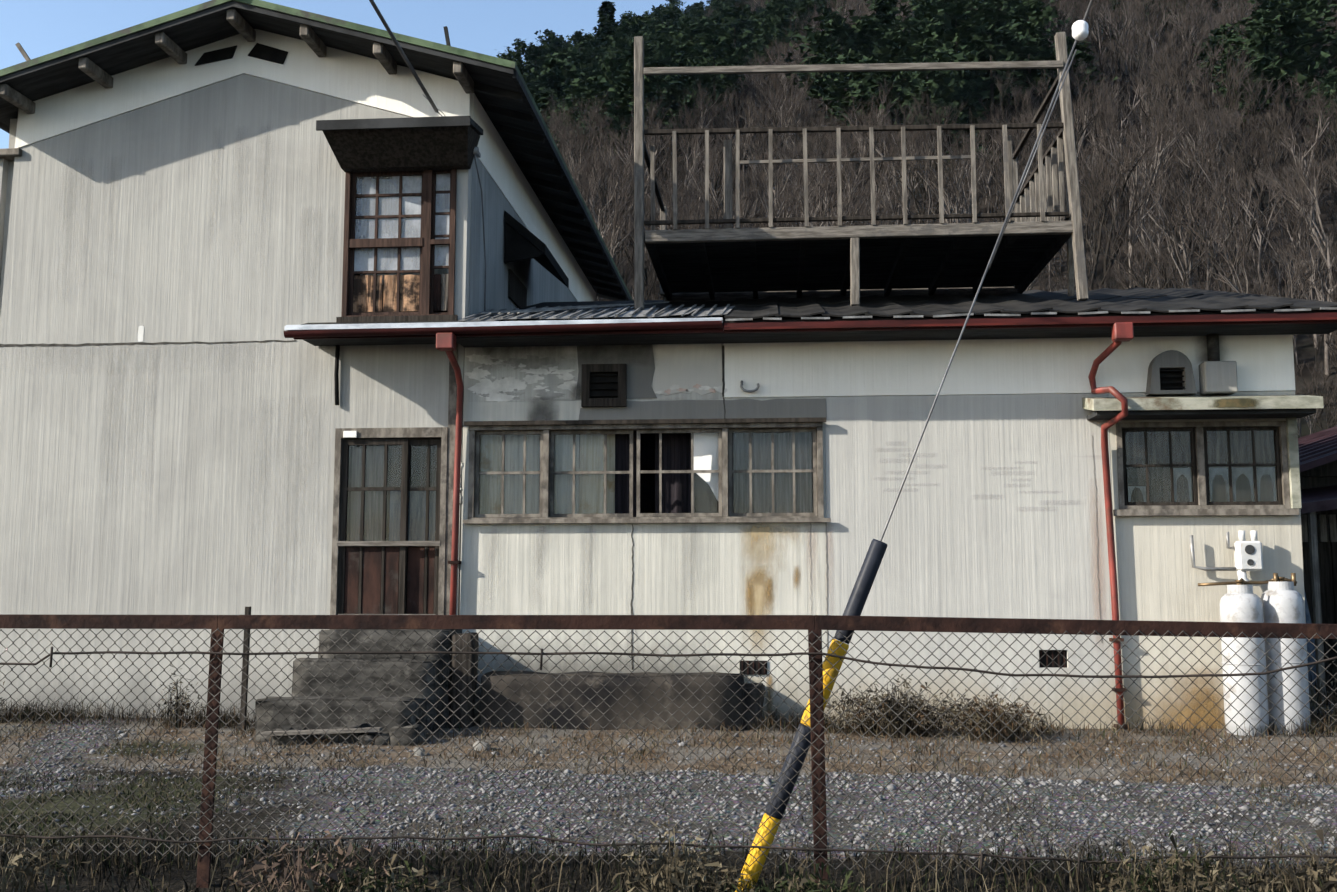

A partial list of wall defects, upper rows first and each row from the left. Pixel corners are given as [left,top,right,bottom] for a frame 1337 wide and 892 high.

peeling [465,346,577,402]
rust [747,525,772,633]